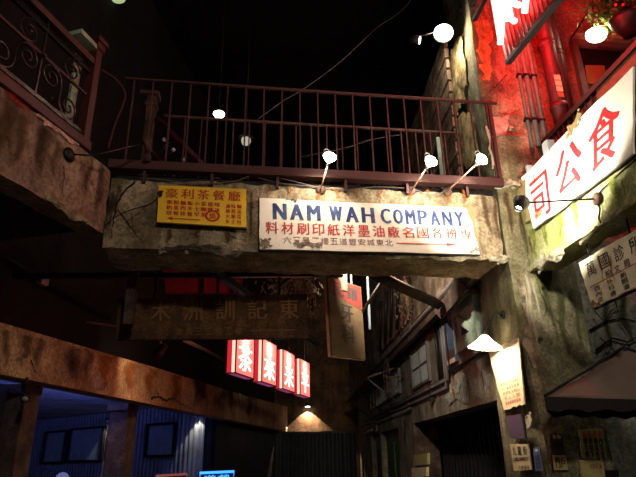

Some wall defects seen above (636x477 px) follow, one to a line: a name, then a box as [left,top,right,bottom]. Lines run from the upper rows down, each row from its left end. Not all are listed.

peeling [474,7,493,81]
crack [111,181,154,242]
spalling [385,204,511,265]
spalling [534,246,565,274]
leakage [524,271,580,351]
crack [151,391,190,408]